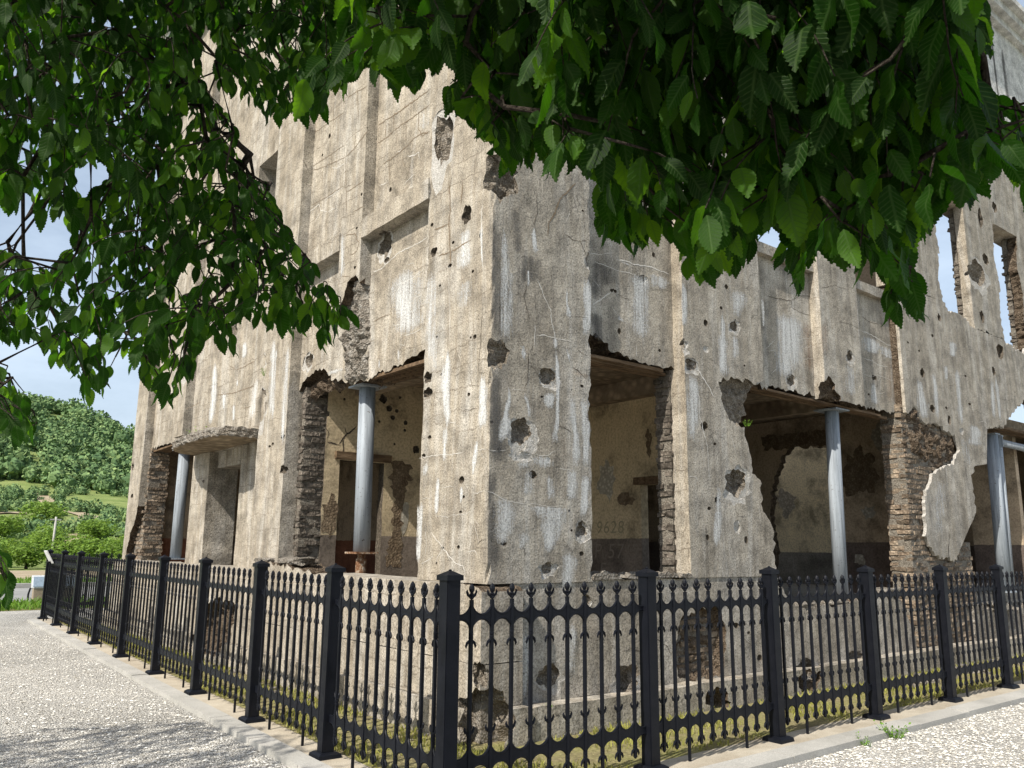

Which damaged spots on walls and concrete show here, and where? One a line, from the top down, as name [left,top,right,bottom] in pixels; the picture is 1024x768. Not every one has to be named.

spalling [431,109,456,195]
flaking render [947,209,1021,352]
flaking render [132,448,170,560]
flaking render [293,280,371,566]
flaking render [385,461,413,568]
spalling [507,418,551,463]
spalling [539,368,561,398]
spalling [719,365,754,428]
spalling [723,464,751,506]
flaking render [842,404,977,647]